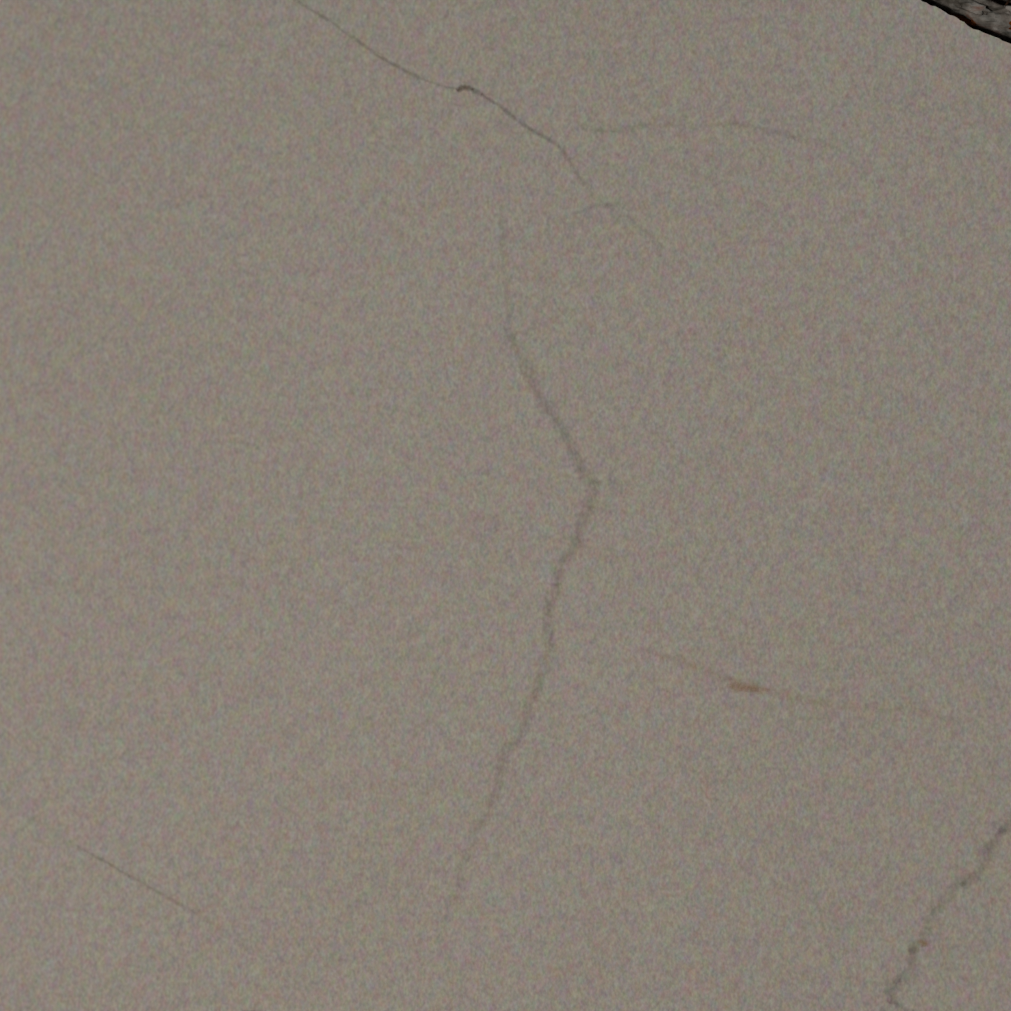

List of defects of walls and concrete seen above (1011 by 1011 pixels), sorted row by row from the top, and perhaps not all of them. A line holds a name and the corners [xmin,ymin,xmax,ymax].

spalling [921,0,1011,44]